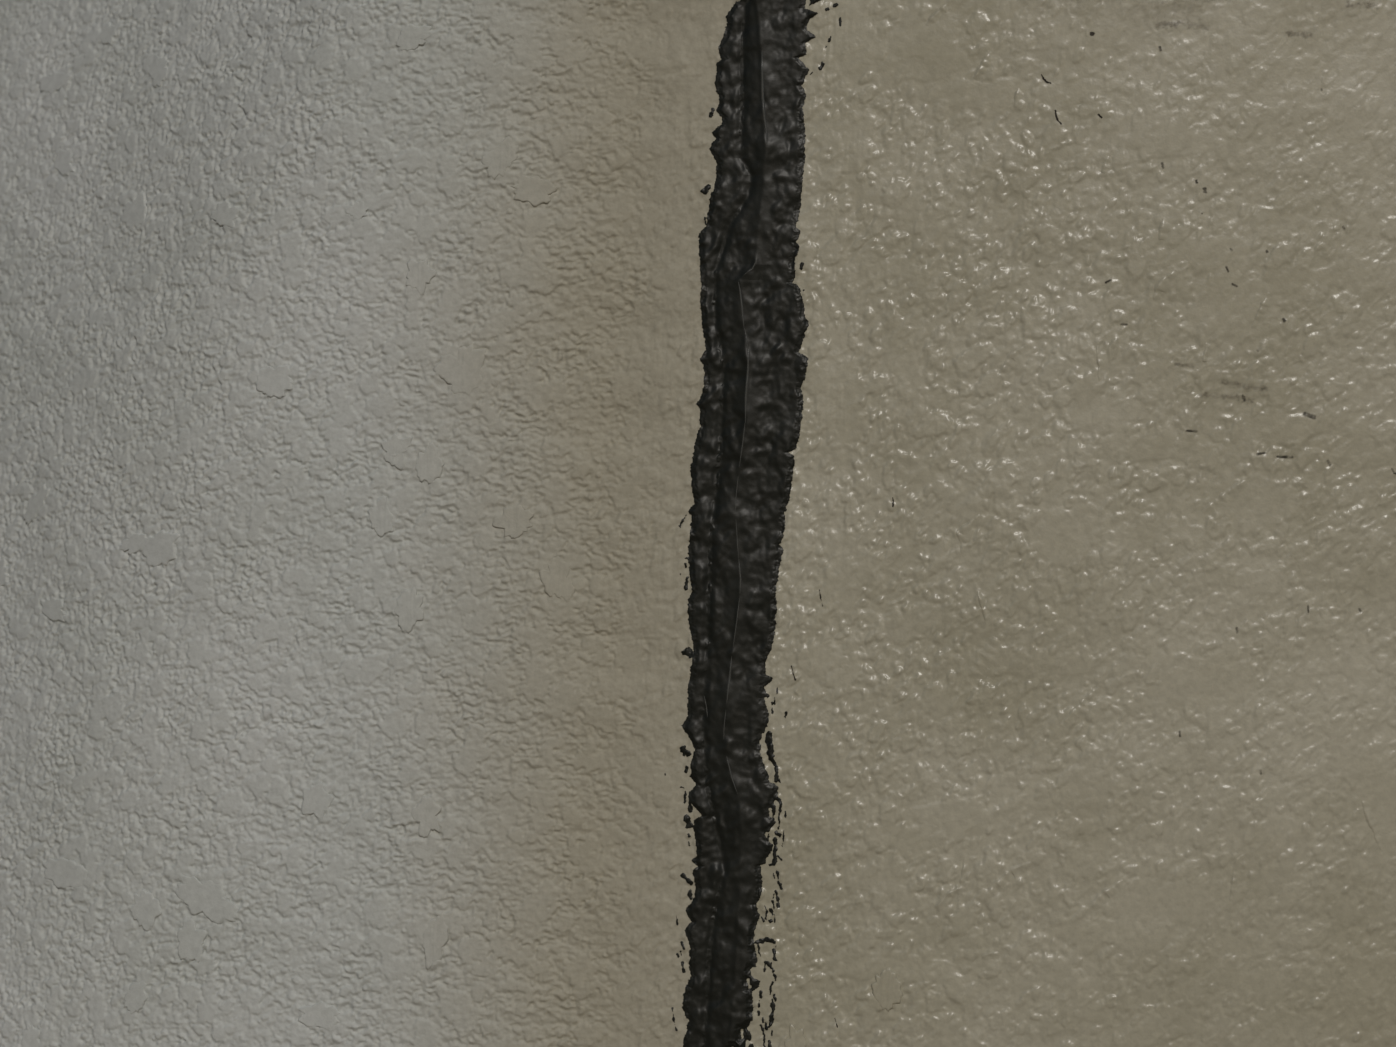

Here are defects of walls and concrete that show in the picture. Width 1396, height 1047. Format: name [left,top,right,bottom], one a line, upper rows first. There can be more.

crack [665,0,842,1047]